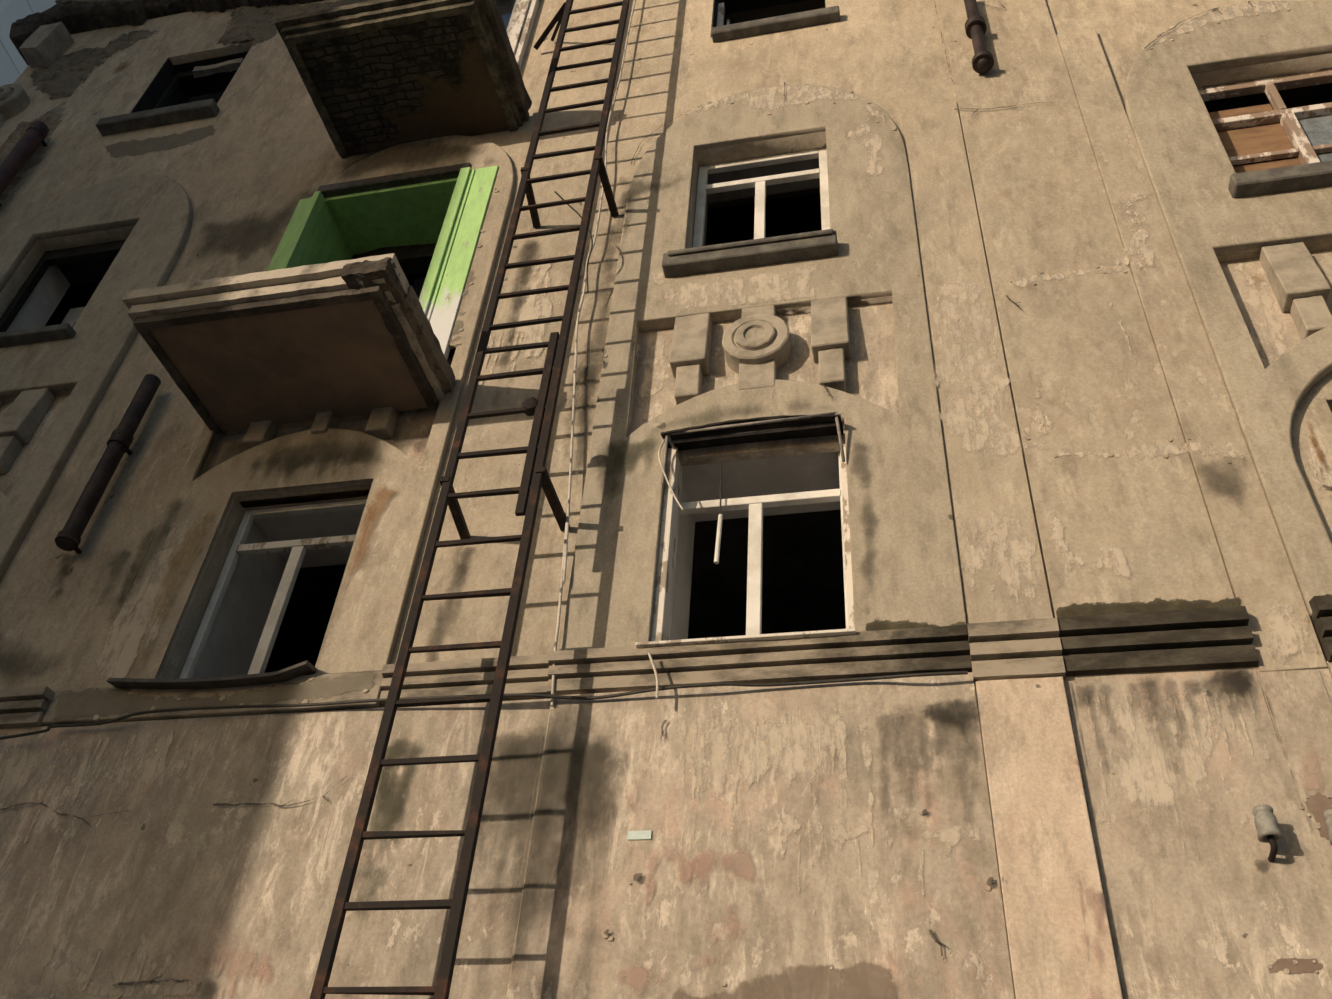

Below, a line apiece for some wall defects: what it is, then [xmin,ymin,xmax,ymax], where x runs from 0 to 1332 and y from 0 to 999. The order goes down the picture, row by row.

flaking render [0,29,158,211]
water stain [344,142,462,175]
flaking render [685,84,896,176]
water stain [96,515,200,680]
water stain [516,718,590,815]
water stain [1085,691,1271,824]
flaking render [1300,792,1332,840]
flaking render [673,962,897,999]
flaking render [1268,958,1323,975]